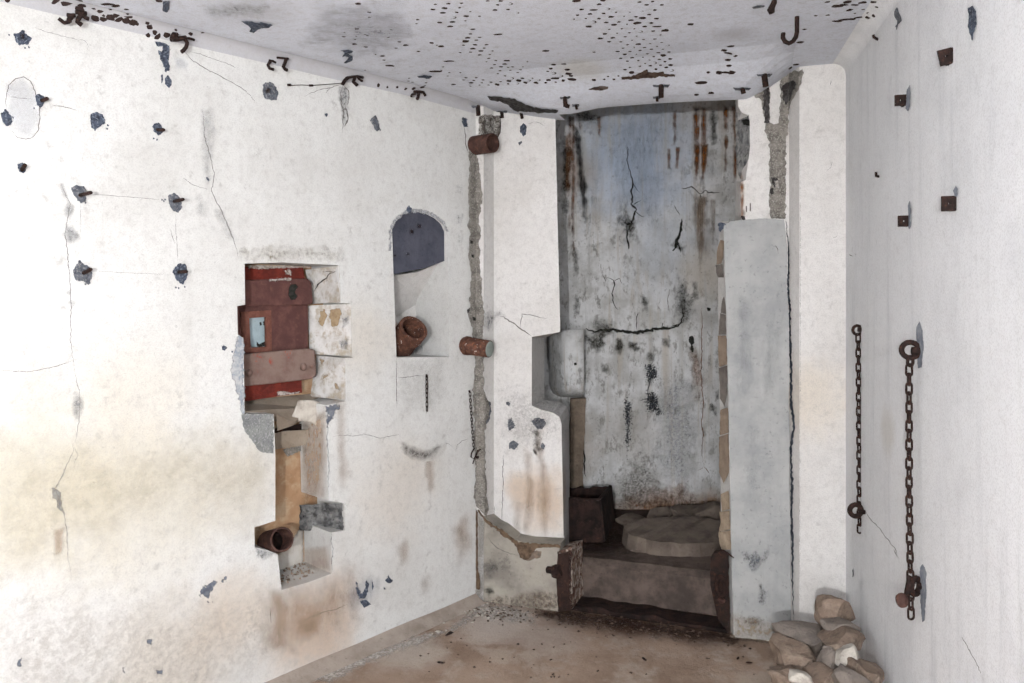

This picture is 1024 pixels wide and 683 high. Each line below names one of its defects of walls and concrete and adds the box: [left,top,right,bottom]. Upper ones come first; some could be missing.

crack [185,118,238,255]
spalling [467,151,485,339]
spalling [487,96,558,145]
crack [624,152,644,249]
crack [672,186,719,253]
spalling [754,70,804,219]
spalling [222,336,301,456]
spalling [472,356,561,561]
leakage [585,325,663,417]
leakage [623,397,632,460]
crack [586,276,709,473]
crack [773,205,801,619]